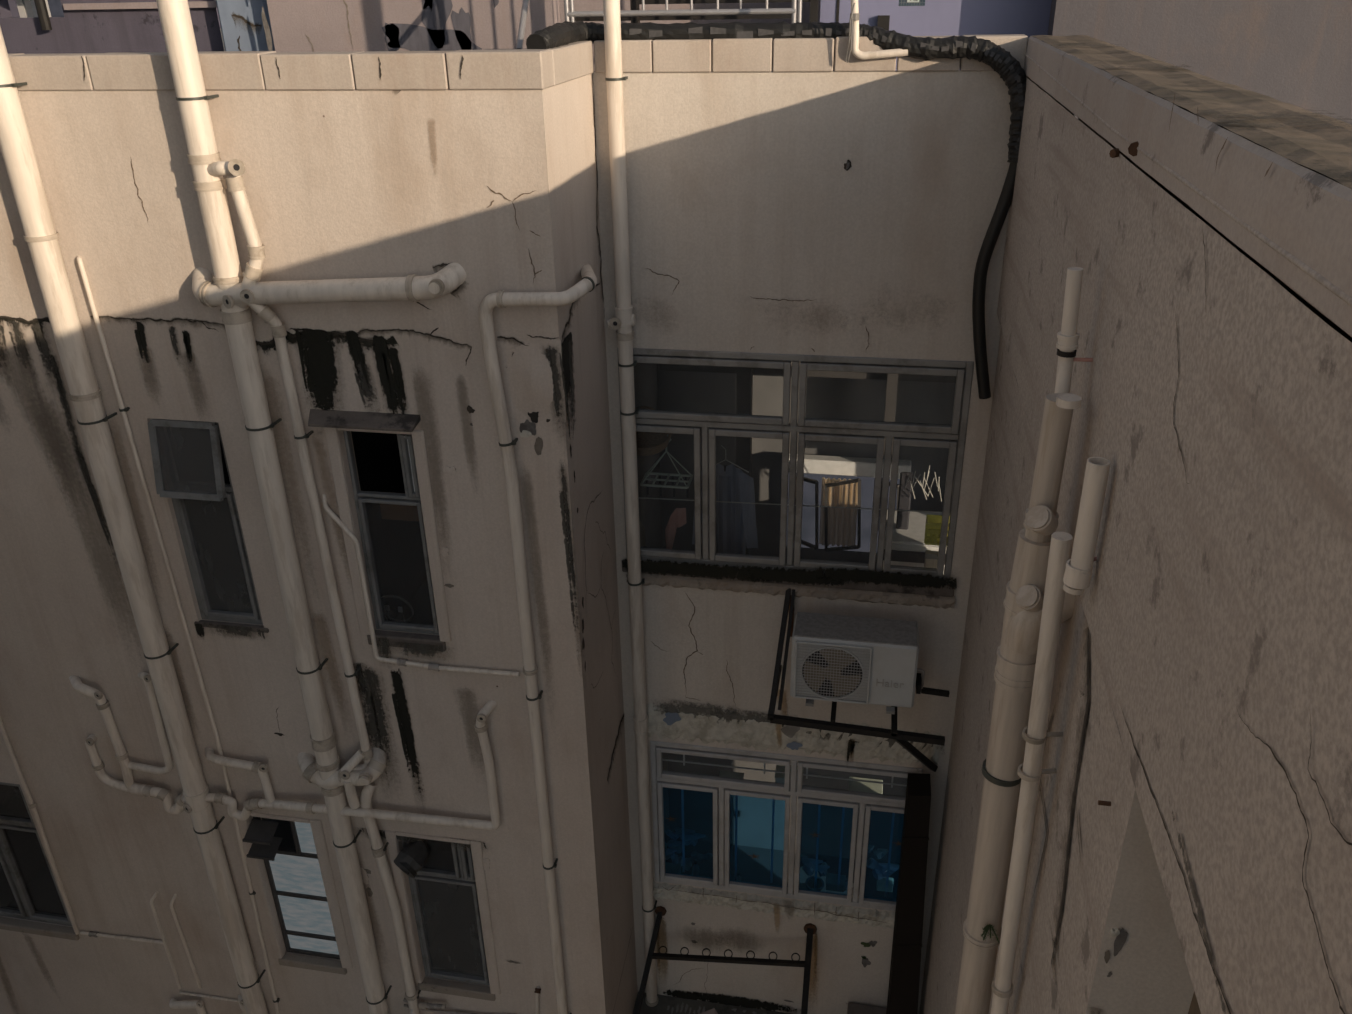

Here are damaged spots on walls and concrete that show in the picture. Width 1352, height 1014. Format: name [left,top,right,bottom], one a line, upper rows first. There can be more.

crack [130,157,148,222]
crack [256,108,605,364]
crack [0,316,50,326]
leakage [0,321,113,545]
leakage [134,322,150,363]
crack [90,316,225,332]
leakage [169,326,192,361]
leakage [295,329,406,414]
leakage [545,333,575,440]
leakage [559,466,578,627]
crack [651,591,736,707]
leakage [354,637,443,793]